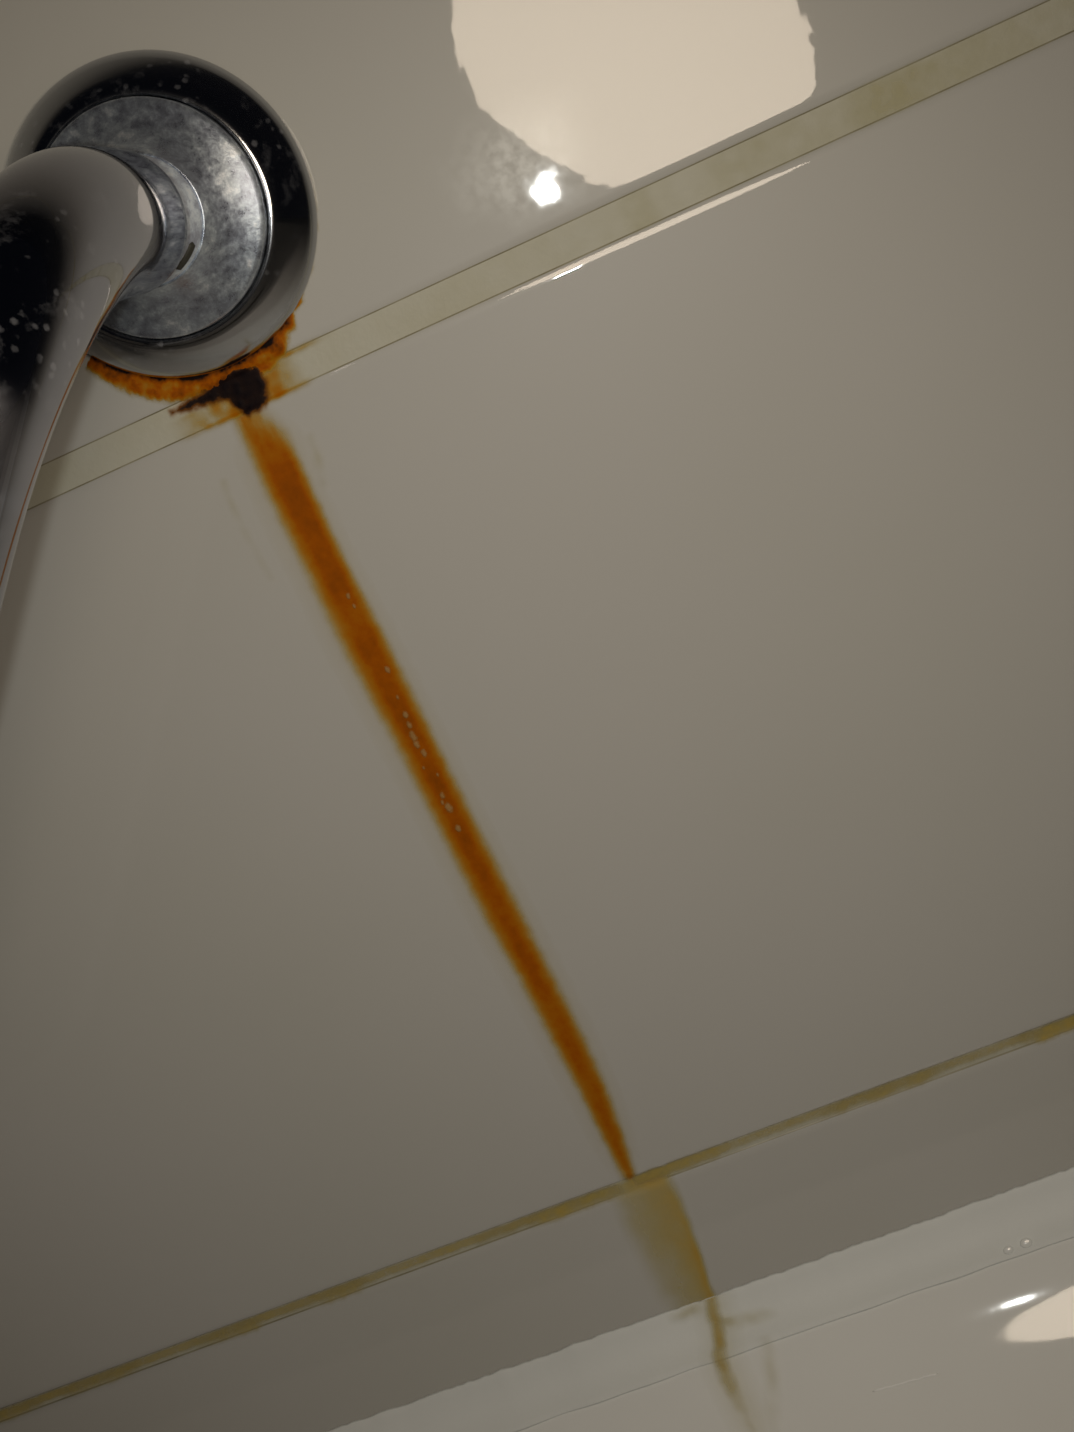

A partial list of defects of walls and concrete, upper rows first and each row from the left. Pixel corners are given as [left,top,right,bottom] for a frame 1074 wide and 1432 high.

rust [87,295,732,1389]